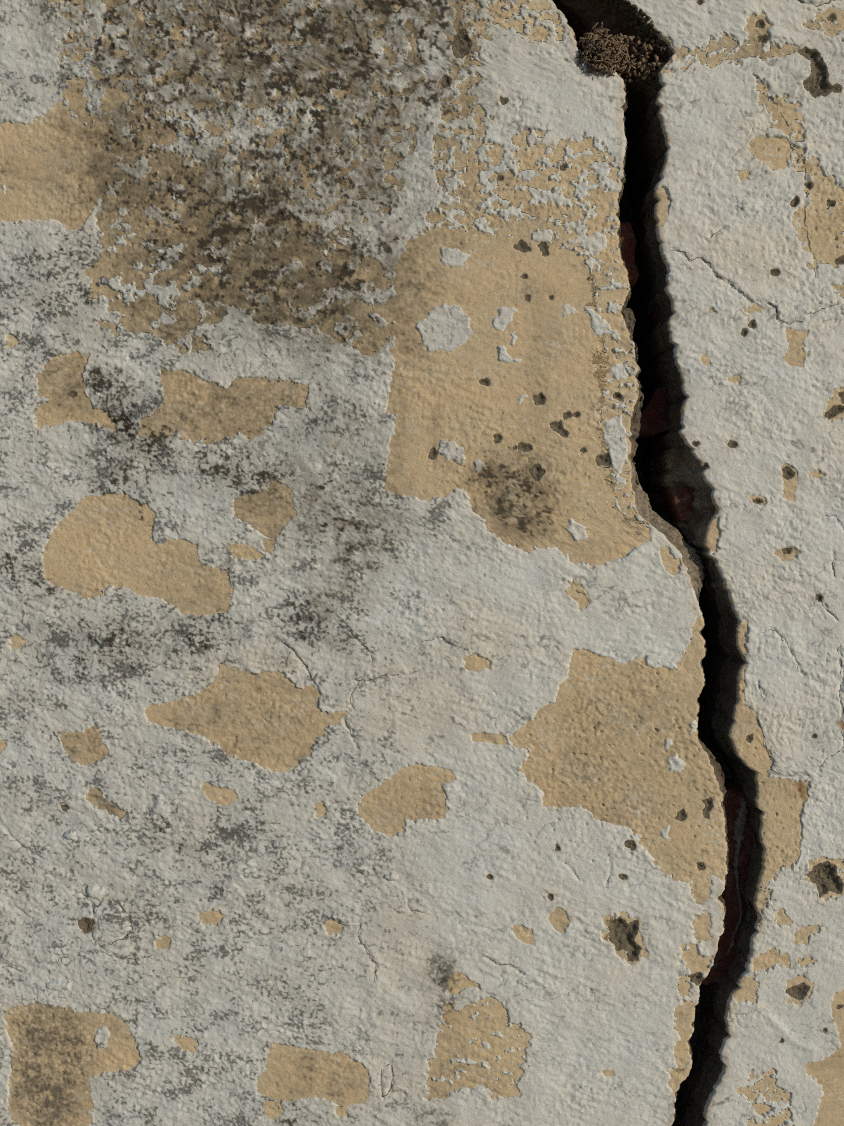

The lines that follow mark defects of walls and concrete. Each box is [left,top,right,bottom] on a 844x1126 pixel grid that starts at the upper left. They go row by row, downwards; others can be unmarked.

water stain [68,0,461,349]
peeling [661,7,844,270]
water stain [33,227,95,313]
peeling [0,0,681,575]
peeling [41,481,297,616]
water stain [317,512,378,564]
crack [552,0,837,1126]
peeling [145,664,347,772]
peeling [358,763,456,837]
peeling [470,617,728,1098]
peeling [4,1002,142,1126]
peeling [424,972,531,1100]